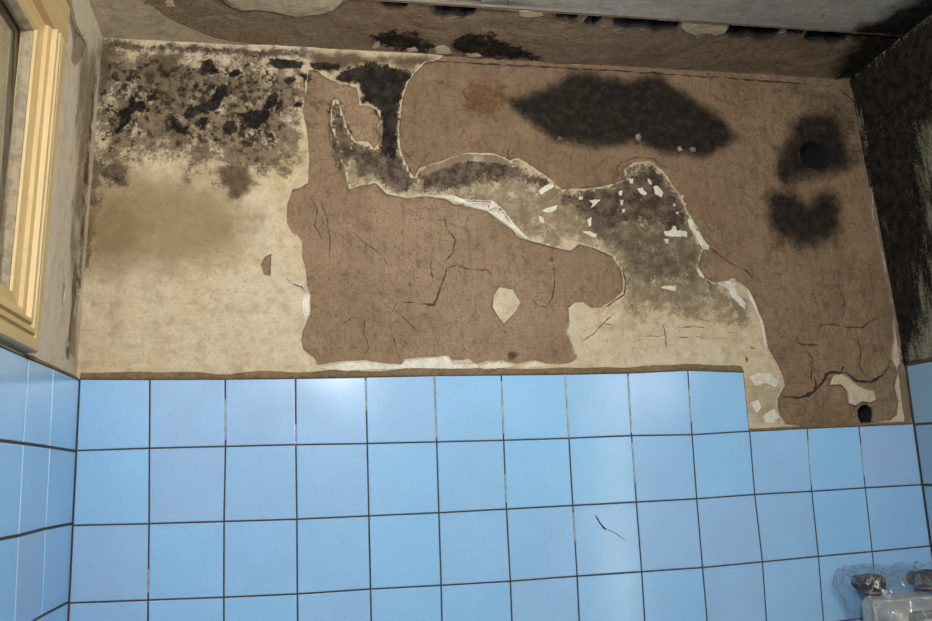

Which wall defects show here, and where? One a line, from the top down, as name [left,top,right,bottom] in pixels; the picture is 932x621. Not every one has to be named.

peeling [66,0,87,66]
crack [310,194,331,260]
leakage [68,29,749,356]
crack [392,216,493,361]
flaking render [144,0,911,426]
crack [534,266,555,307]
crack [773,265,892,399]
leakage [834,0,932,369]